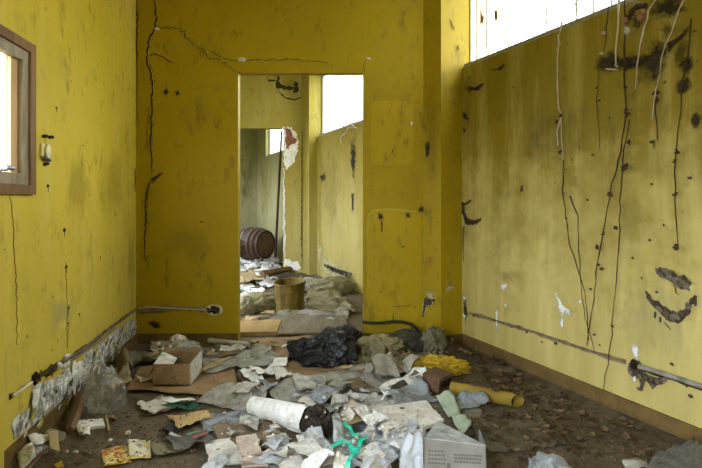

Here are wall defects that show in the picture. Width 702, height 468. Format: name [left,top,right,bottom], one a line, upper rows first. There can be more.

water stain [597,26,693,94]
water stain [652,0,682,17]
crack [134,0,327,269]
spalling [282,126,301,273]
crack [9,197,18,344]
spalling [645,267,698,324]
spalling [12,319,137,440]
spalling [627,359,667,391]